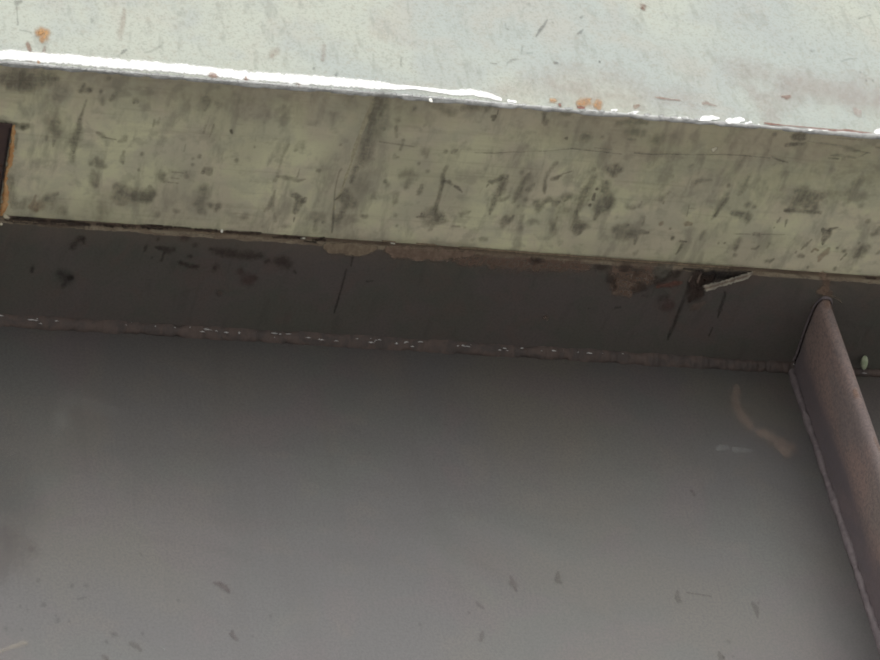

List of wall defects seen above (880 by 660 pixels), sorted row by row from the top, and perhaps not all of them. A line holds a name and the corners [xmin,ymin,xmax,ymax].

peeling [302,237,396,257]
peeling [459,247,764,273]